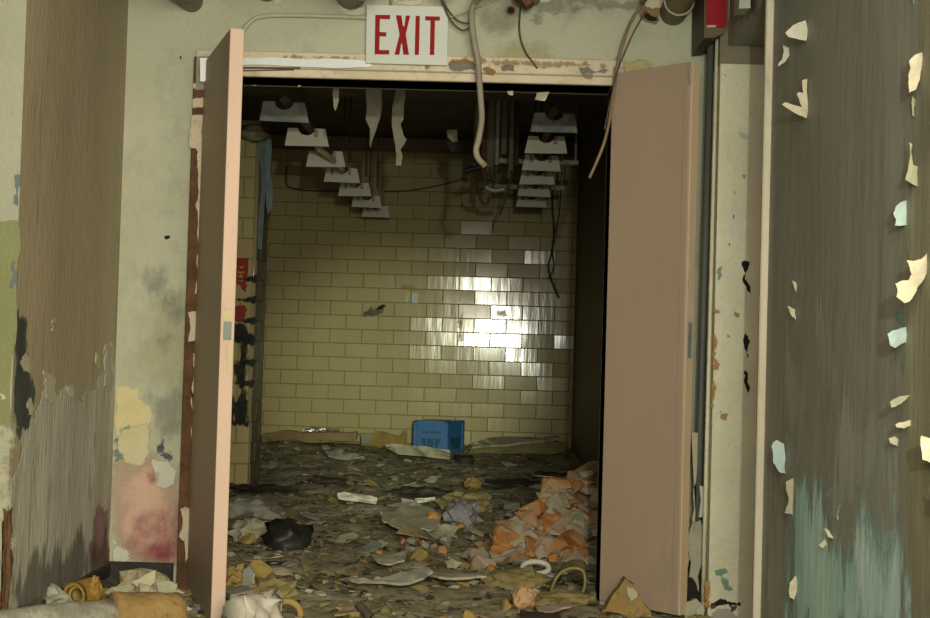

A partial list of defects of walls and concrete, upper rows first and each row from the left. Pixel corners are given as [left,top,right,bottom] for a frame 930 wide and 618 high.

corrosion [448,59,514,76]
peeling [778,20,808,66]
peeling [908,0,930,133]
peeling [782,79,808,118]
peeling [366,89,407,166]
peeling [155,311,196,363]
peeling [771,142,930,618]
peeling [0,220,176,609]
peeling [715,568,733,591]